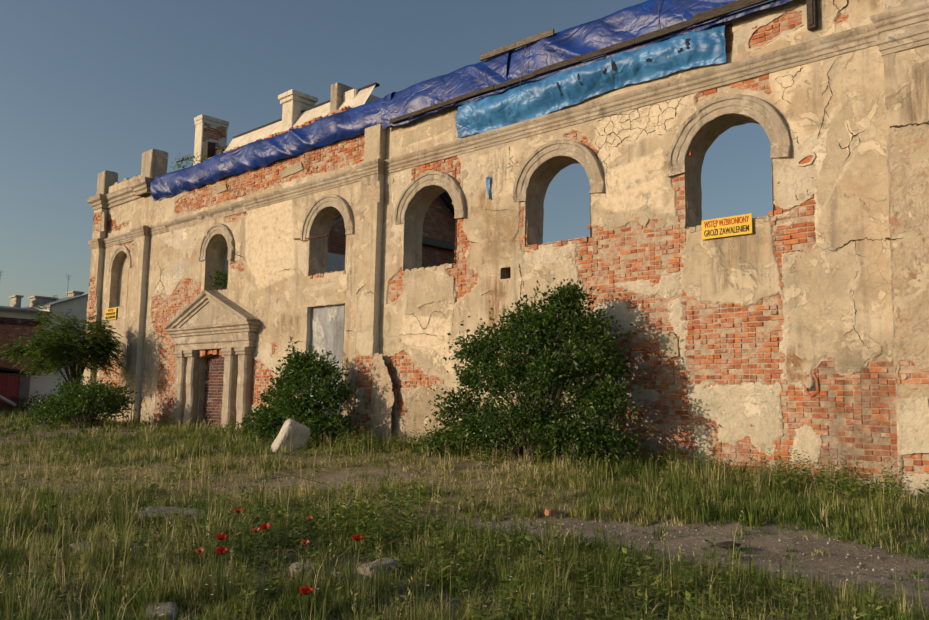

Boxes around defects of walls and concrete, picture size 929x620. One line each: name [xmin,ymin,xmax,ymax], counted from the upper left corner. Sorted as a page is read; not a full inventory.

peeling [724,2,807,56]
flaking render [203,122,226,147]
flaking render [175,133,365,214]
peeling [364,154,481,247]
crack [794,61,864,165]
crack [890,120,929,128]
flaking render [446,218,479,302]
flaking render [514,100,929,499]
crack [824,237,902,257]
flaking render [151,269,201,426]
flaking render [346,331,453,445]